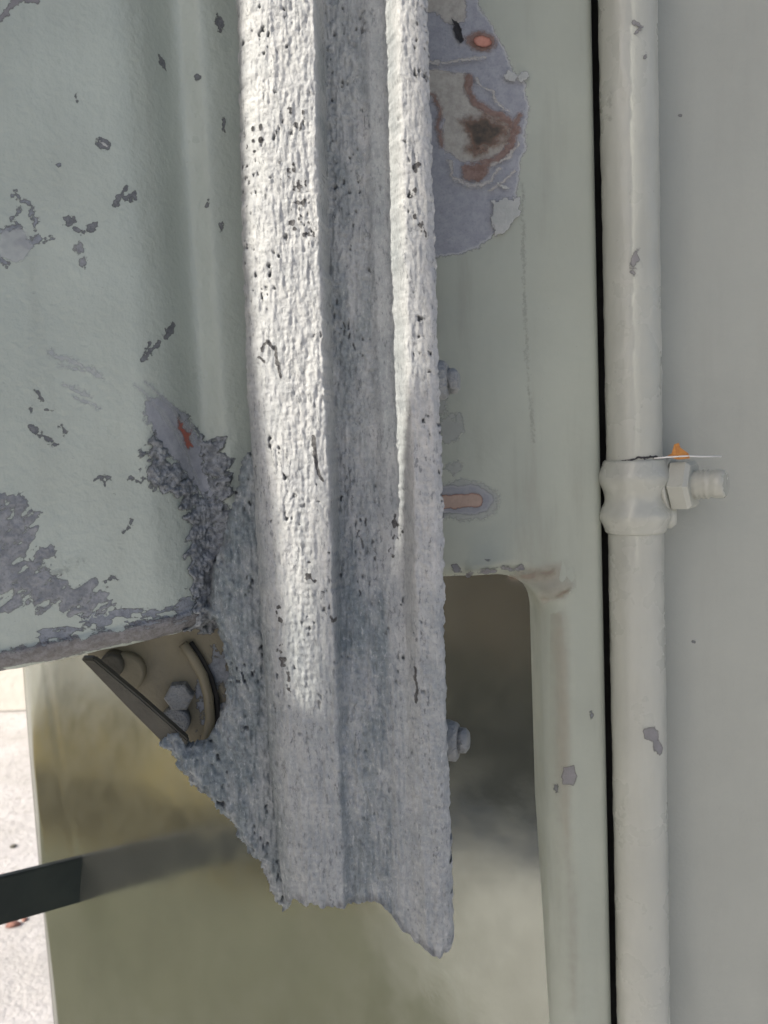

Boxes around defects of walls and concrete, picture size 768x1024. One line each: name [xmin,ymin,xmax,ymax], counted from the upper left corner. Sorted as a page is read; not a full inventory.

corrosion [427,0,530,258]
peeling [0,189,55,269]
corrosion [442,479,499,520]
peeling [0,389,234,710]
peeling [554,765,577,792]
peeling [643,727,663,755]